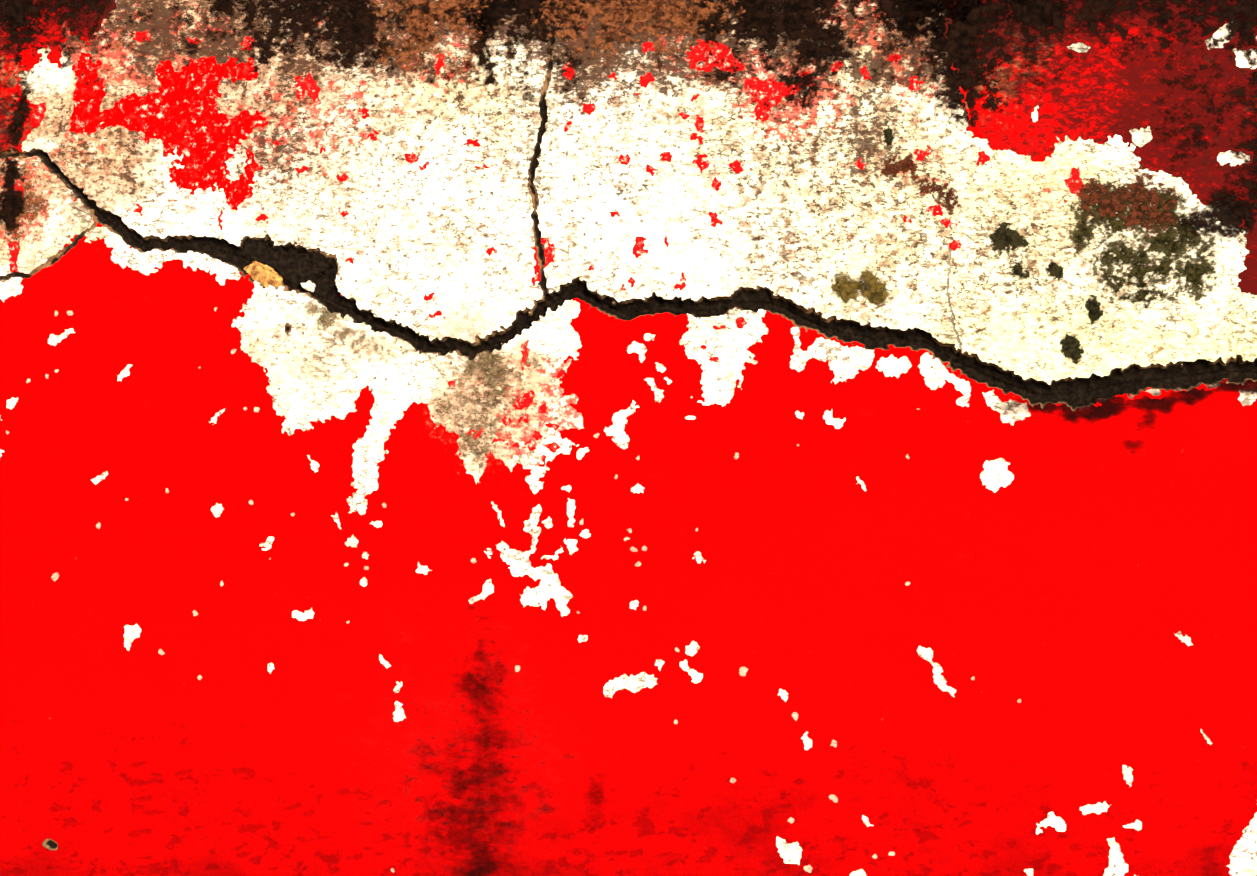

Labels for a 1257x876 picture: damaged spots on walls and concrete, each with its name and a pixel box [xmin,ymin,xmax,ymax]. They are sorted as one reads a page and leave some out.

crack [0,148,245,281]
crack [336,0,1257,411]
peeling [0,0,1257,617]
peeling [603,659,665,698]
peeling [680,641,703,683]
peeling [1103,819,1142,876]
peeling [1227,812,1257,876]